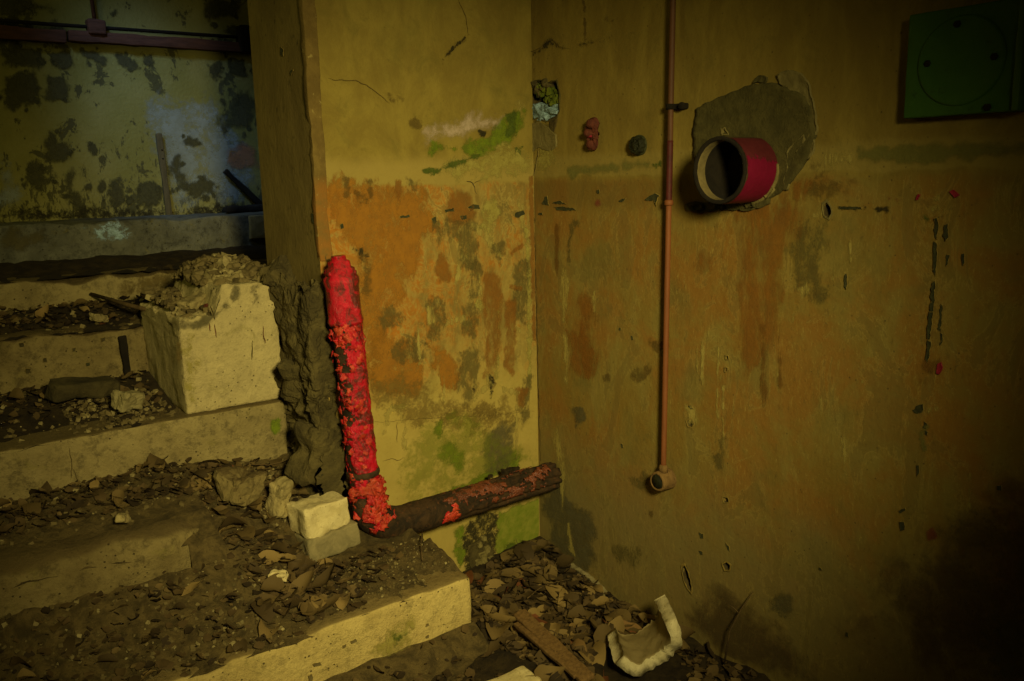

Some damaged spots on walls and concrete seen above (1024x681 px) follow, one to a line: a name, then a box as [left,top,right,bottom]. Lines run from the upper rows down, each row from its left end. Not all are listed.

water stain [426,116,497,135]
spalling [531,78,561,169]
water stain [3,203,239,220]